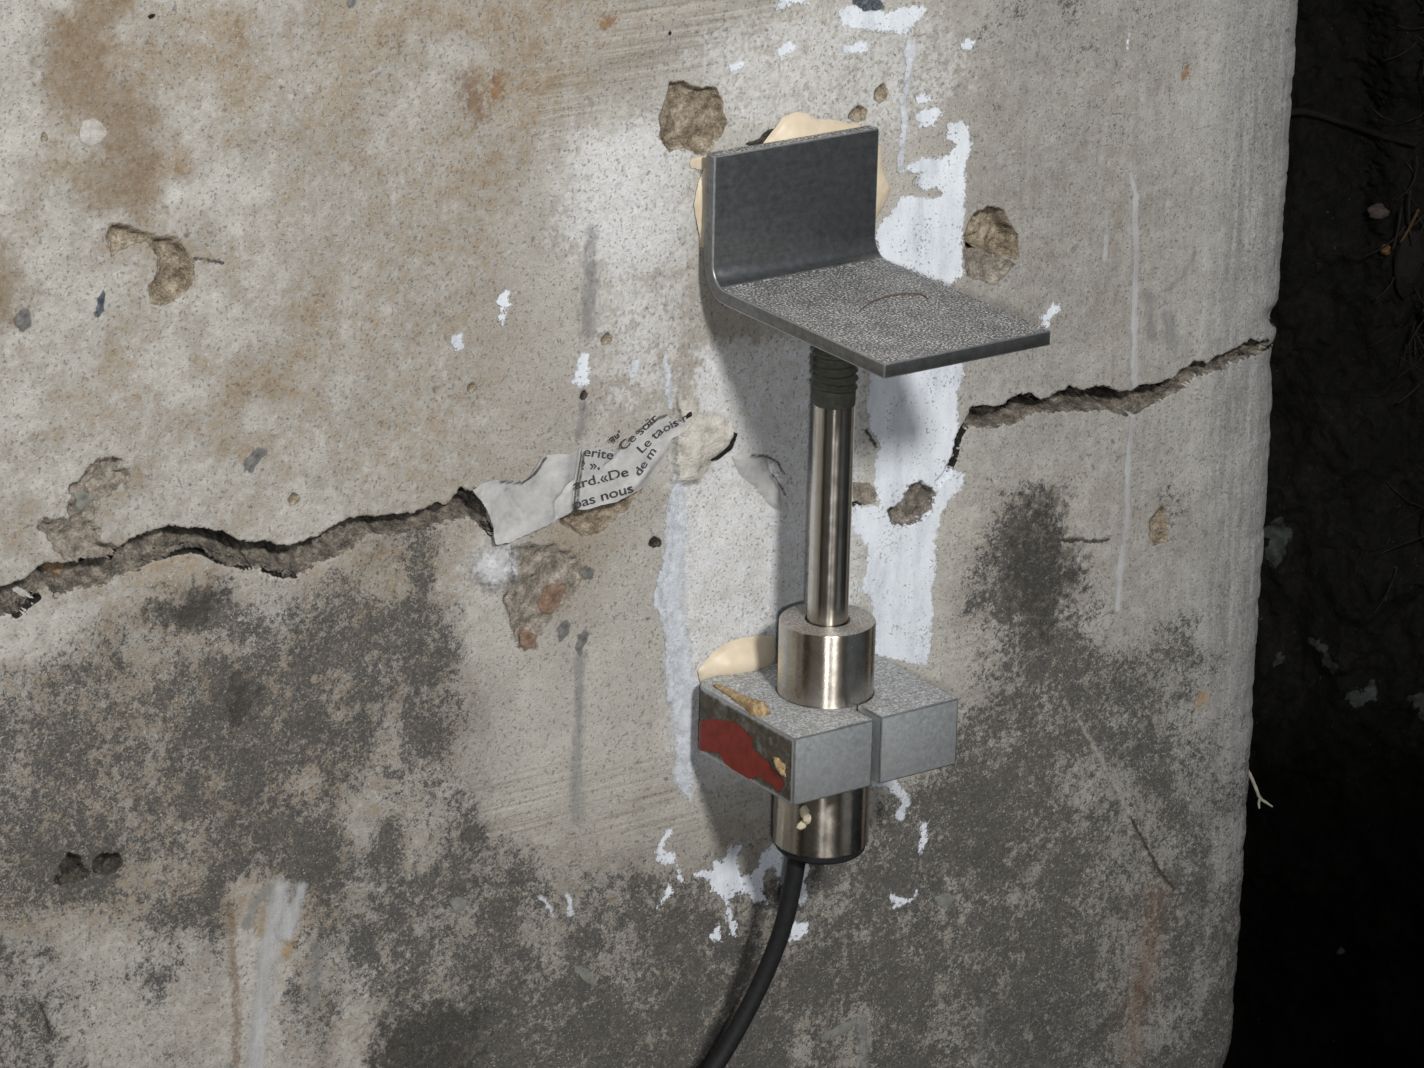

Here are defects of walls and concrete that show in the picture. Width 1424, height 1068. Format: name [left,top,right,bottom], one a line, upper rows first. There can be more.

spalling [658,79,727,156]
peeling [838,5,1020,286]
spalling [106,223,195,306]
efflorescence [1129,172,1139,388]
crack [908,318,1275,489]
crack [0,487,494,619]
peeling [648,458,699,802]
peeling [851,363,966,665]
crack [1062,536,1110,544]
efflorescence [1115,411,1134,611]
efflorescence [249,883,305,1068]
peeling [654,829,788,943]